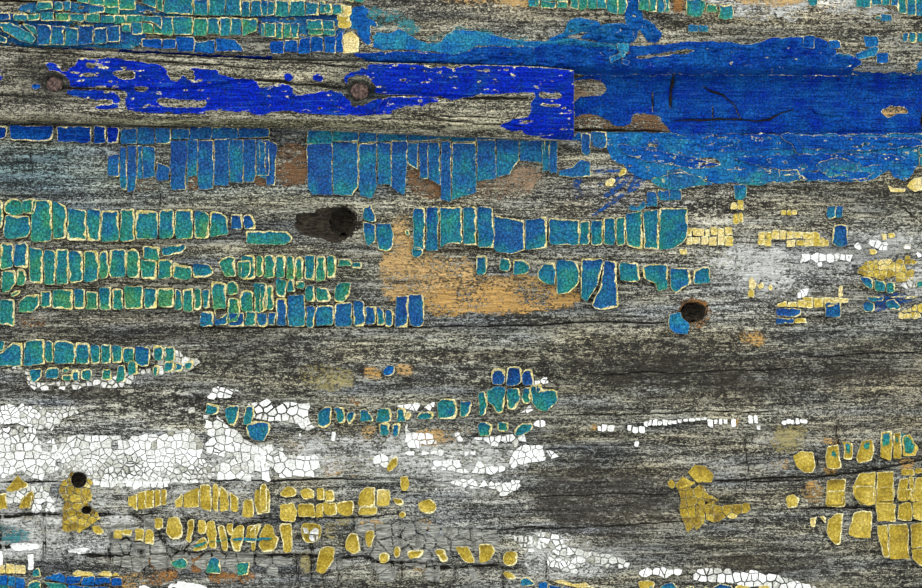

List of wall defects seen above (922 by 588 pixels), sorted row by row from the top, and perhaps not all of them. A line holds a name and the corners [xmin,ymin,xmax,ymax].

peeling [0,0,922,328]
peeling [668,312,690,334]
peeling [0,339,200,390]
peeling [628,417,736,447]
peeling [0,365,630,588]
peeling [668,465,750,532]
peeling [786,494,800,508]
peeling [793,431,922,566]
peeling [638,567,816,588]